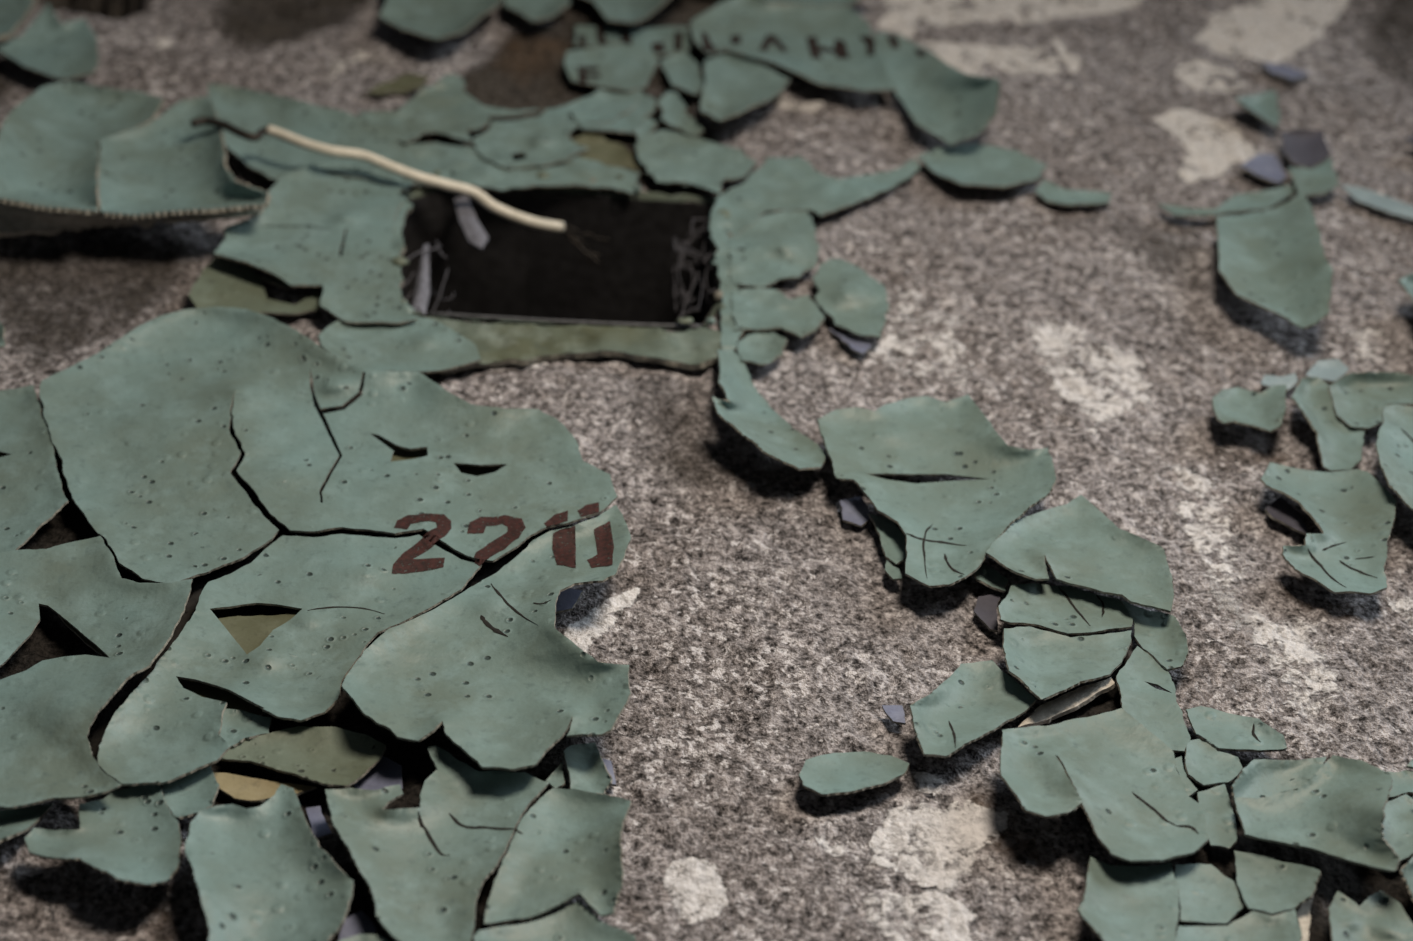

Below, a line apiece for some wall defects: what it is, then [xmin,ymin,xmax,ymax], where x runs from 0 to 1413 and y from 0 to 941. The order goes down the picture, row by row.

peeling [1158,62,1413,329]
crack [37,398,96,539]
crack [310,387,341,500]
peeling [0,0,1047,941]
peeling [1211,359,1413,595]
crack [90,408,355,761]
crack [307,515,599,645]
peeling [817,395,1413,901]
crack [418,811,523,856]
crack [1132,792,1199,834]
peeling [1077,851,1321,941]
peeling [1327,890,1413,941]